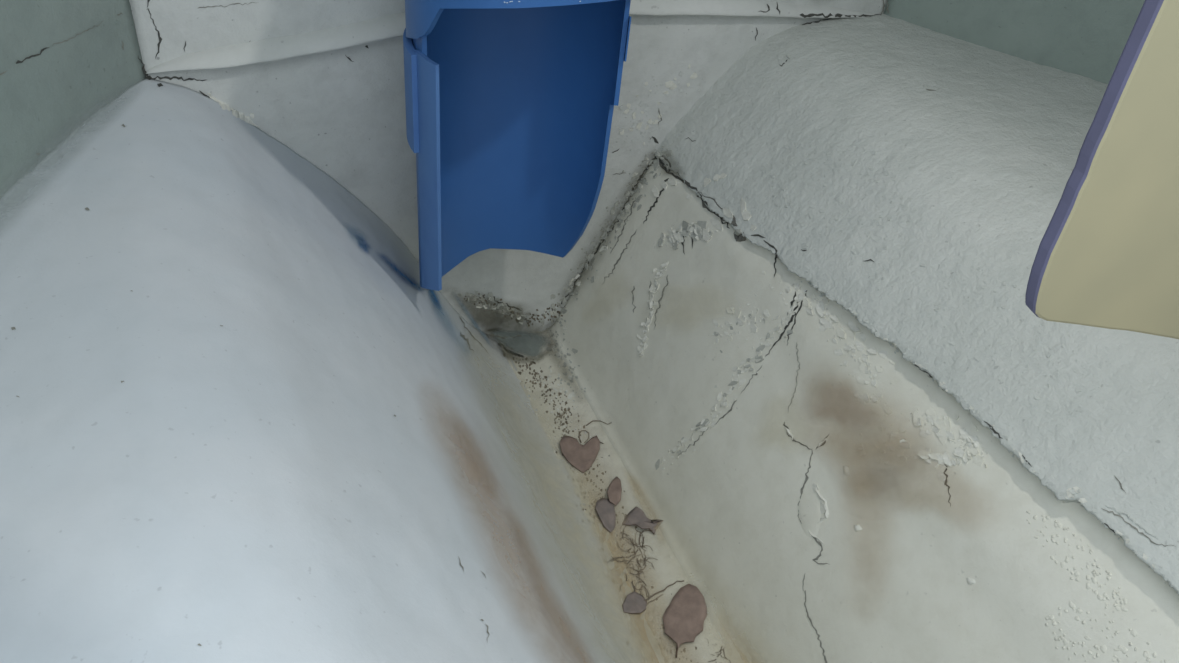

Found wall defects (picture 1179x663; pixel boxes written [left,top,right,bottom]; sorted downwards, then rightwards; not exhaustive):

crack [0,0,259,127]
peeling [458,137,672,401]
peeling [658,221,718,254]
crack [652,156,808,276]
crack [783,342,829,663]